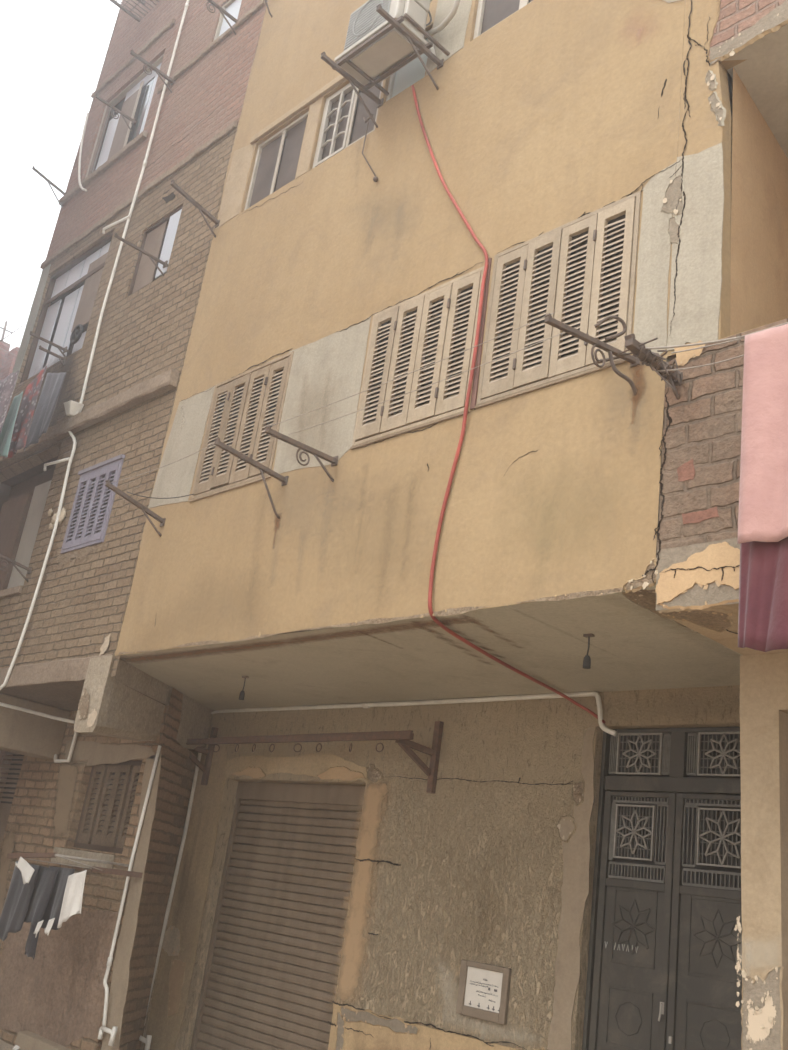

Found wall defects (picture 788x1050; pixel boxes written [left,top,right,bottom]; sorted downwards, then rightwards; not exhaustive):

flaking render [705,0,788,126]
crack [577,0,710,336]
crack [642,387,740,582]
flaking render [99,558,739,656]
crack [383,776,573,785]
crack [355,858,401,866]
crack [327,1001,525,1049]
peeling [734,916,784,1050]